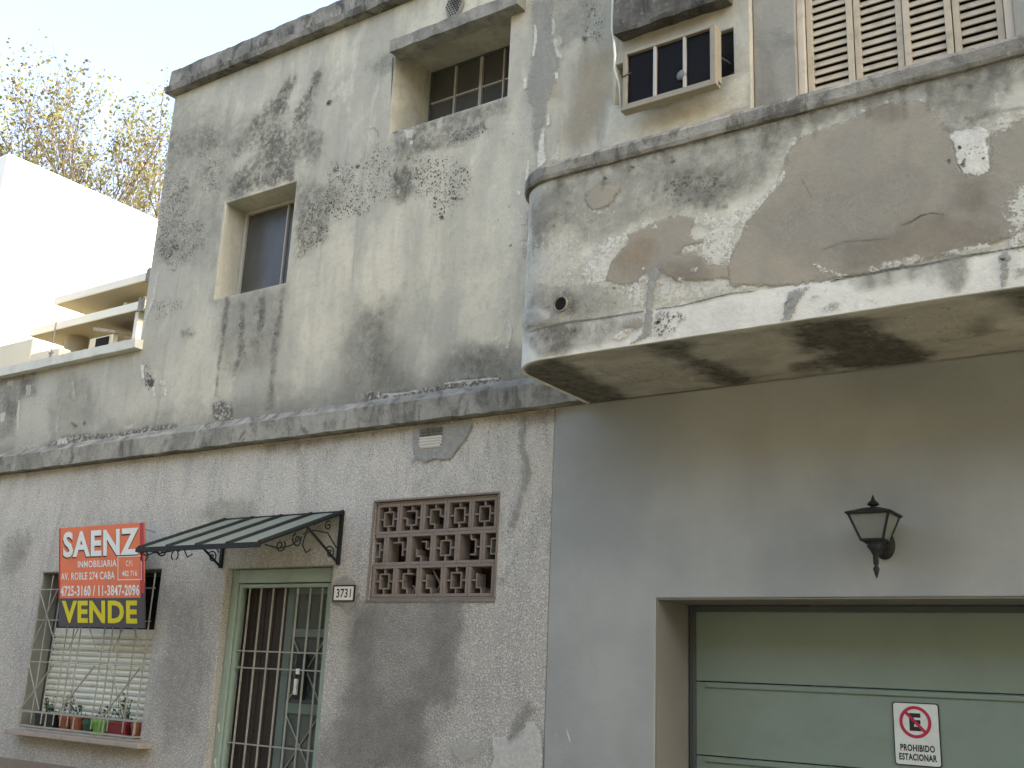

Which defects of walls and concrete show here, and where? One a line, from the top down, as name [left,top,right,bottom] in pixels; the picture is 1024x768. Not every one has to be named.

leakage [233,76,322,192]
peeling [508,74,1024,353]
leakage [216,298,282,384]
flaking render [362,376,502,400]
leakage [648,343,750,386]
leakage [788,318,933,368]
flaking render [42,421,174,447]